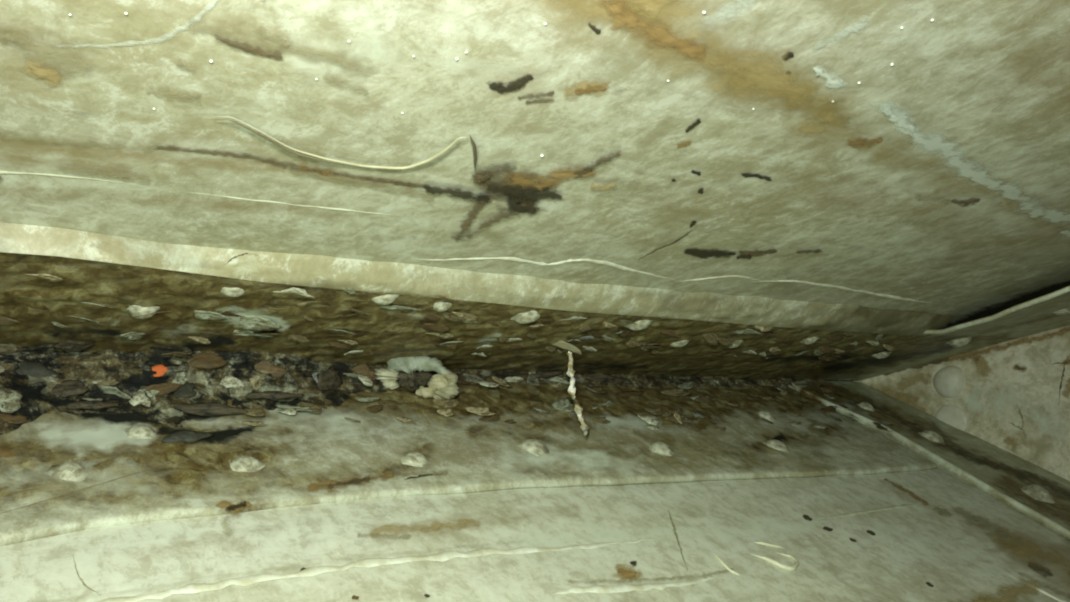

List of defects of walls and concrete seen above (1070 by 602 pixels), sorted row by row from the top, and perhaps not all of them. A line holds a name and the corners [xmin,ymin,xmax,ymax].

rust [560,0,839,134]
rust [849,138,883,147]
rust [156,147,621,241]
crack [943,281,1070,329]
damp [954,509,1066,602]